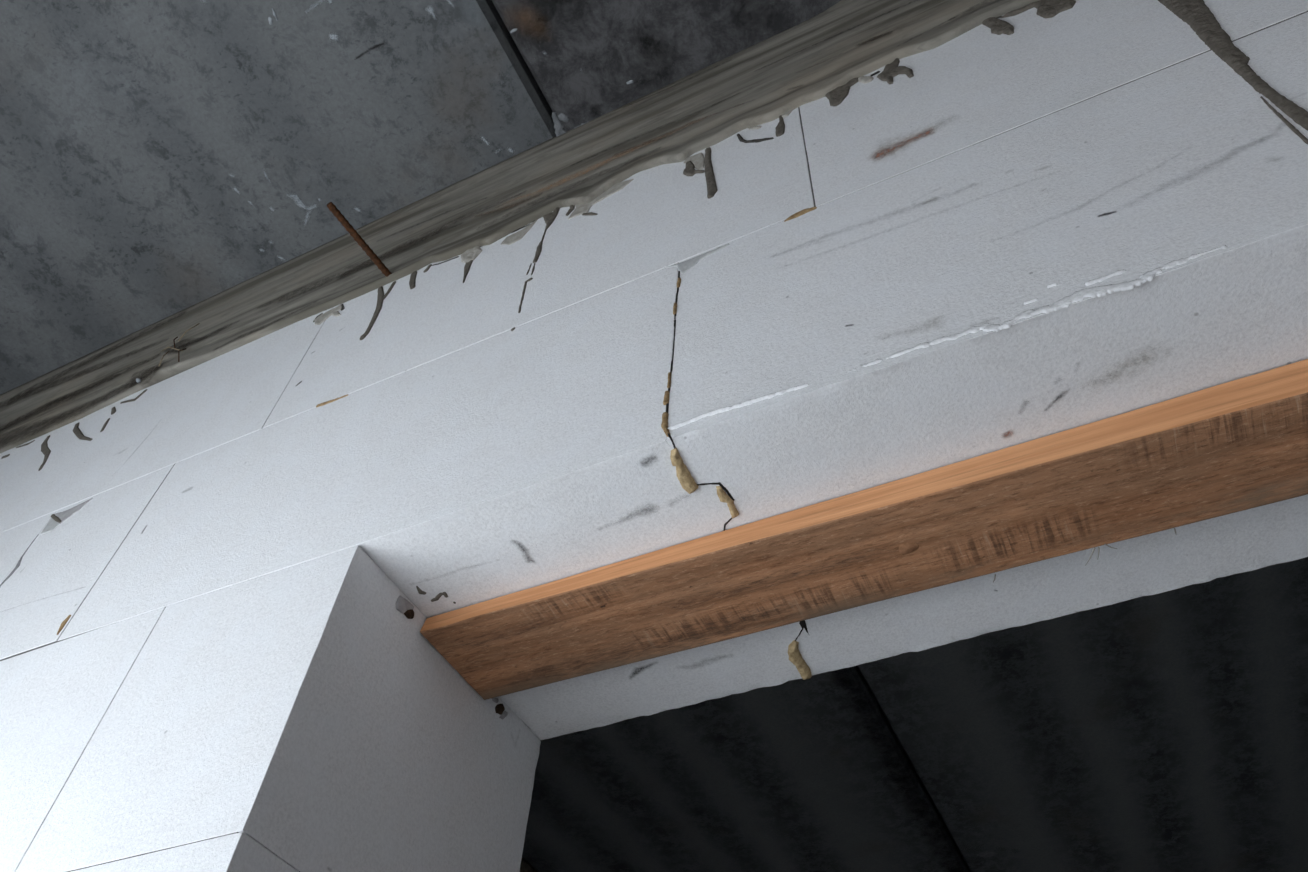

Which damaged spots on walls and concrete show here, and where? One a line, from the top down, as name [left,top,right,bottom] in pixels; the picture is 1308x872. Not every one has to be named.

damp [1260,96,1308,144]
damp [179,149,657,349]
damp [0,311,186,448]
crack [661,271,739,531]
crack [788,620,812,680]